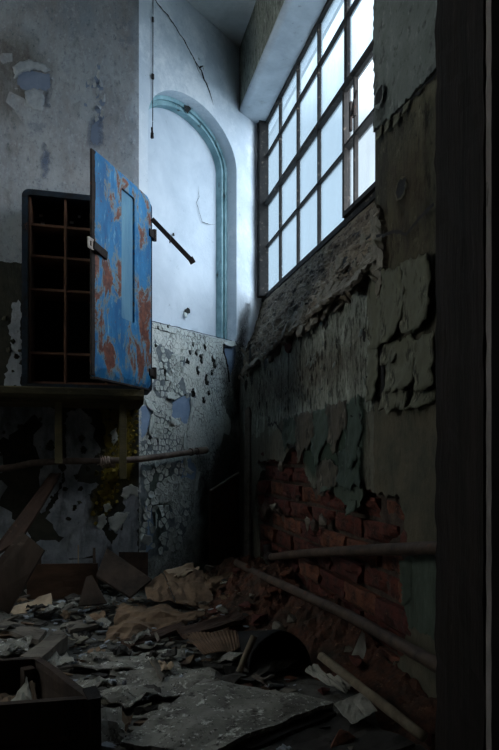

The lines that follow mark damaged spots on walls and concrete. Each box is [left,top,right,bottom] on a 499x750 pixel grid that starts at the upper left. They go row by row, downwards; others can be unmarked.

peeling [11,58,54,112]
crack [155,0,213,102]
flaking render [372,0,437,141]
flaking render [0,204,437,640]